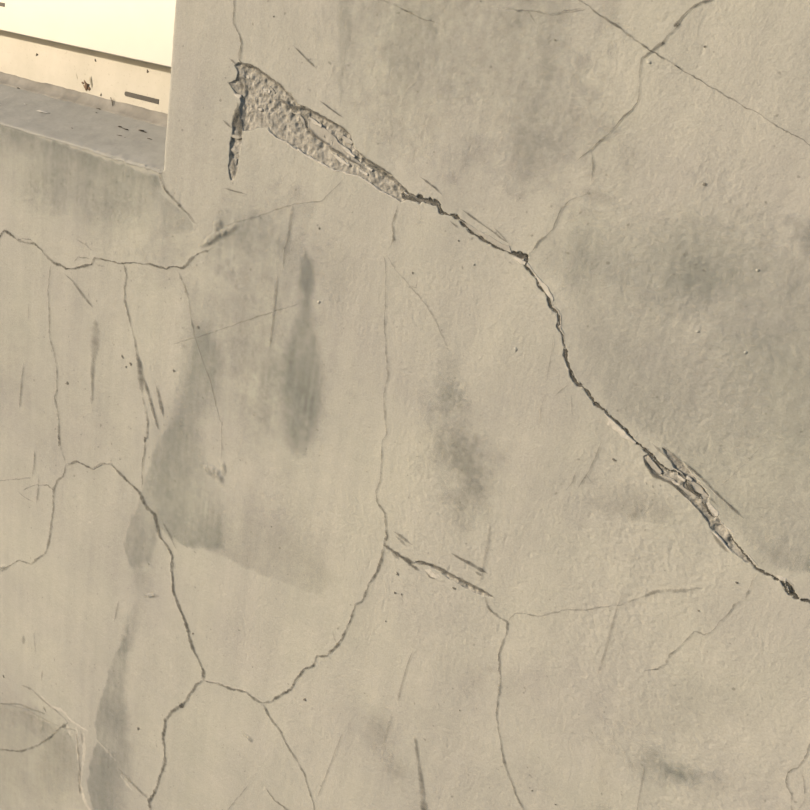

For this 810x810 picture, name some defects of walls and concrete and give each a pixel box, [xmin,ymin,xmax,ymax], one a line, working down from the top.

crack [560,9,621,28]
spalling [228,62,408,202]
crack [0,230,196,270]
crack [401,188,716,518]
spalling [644,448,759,567]
crack [730,536,810,603]
crack [63,461,384,807]